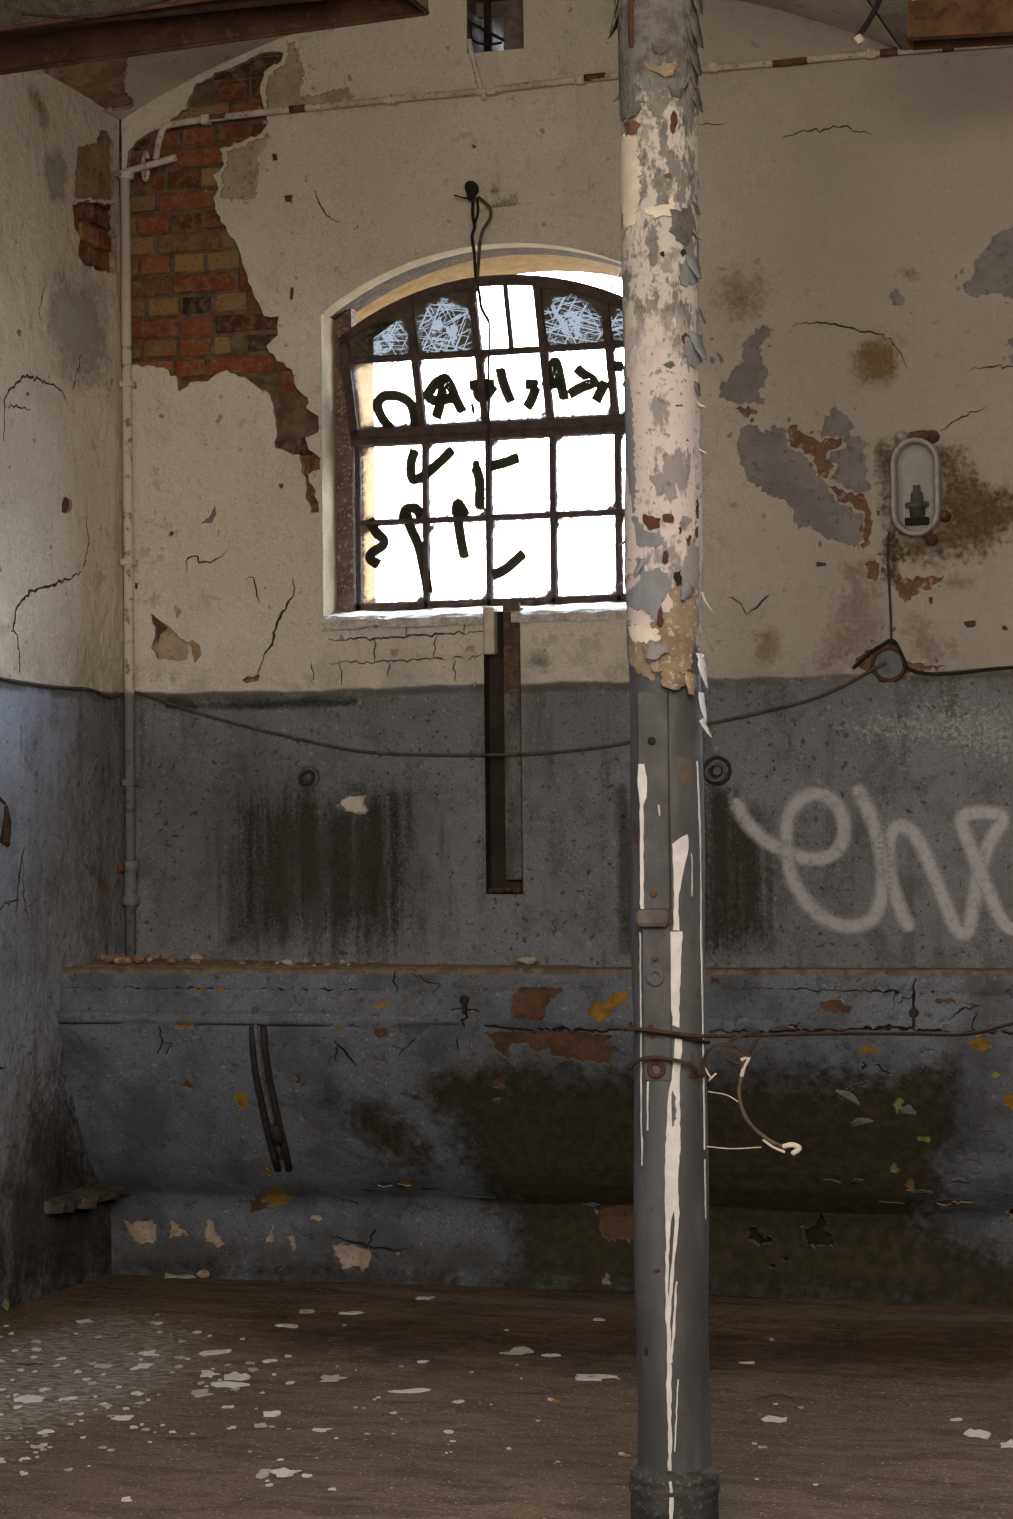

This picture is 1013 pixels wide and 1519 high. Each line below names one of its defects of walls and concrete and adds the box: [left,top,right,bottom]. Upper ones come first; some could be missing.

peeling [644,0,704,113]
flaking render [43,38,354,514]
crack [3,338,81,442]
peeling [688,307,944,604]
leakage [876,443,1013,583]
crack [11,517,89,673]
crack [185,550,295,674]
leakage [247,802,397,947]
peeling [484,986,629,1106]
peeling [835,1089,874,1128]
peeling [893,1097,917,1116]
spalling [330,1242,372,1272]